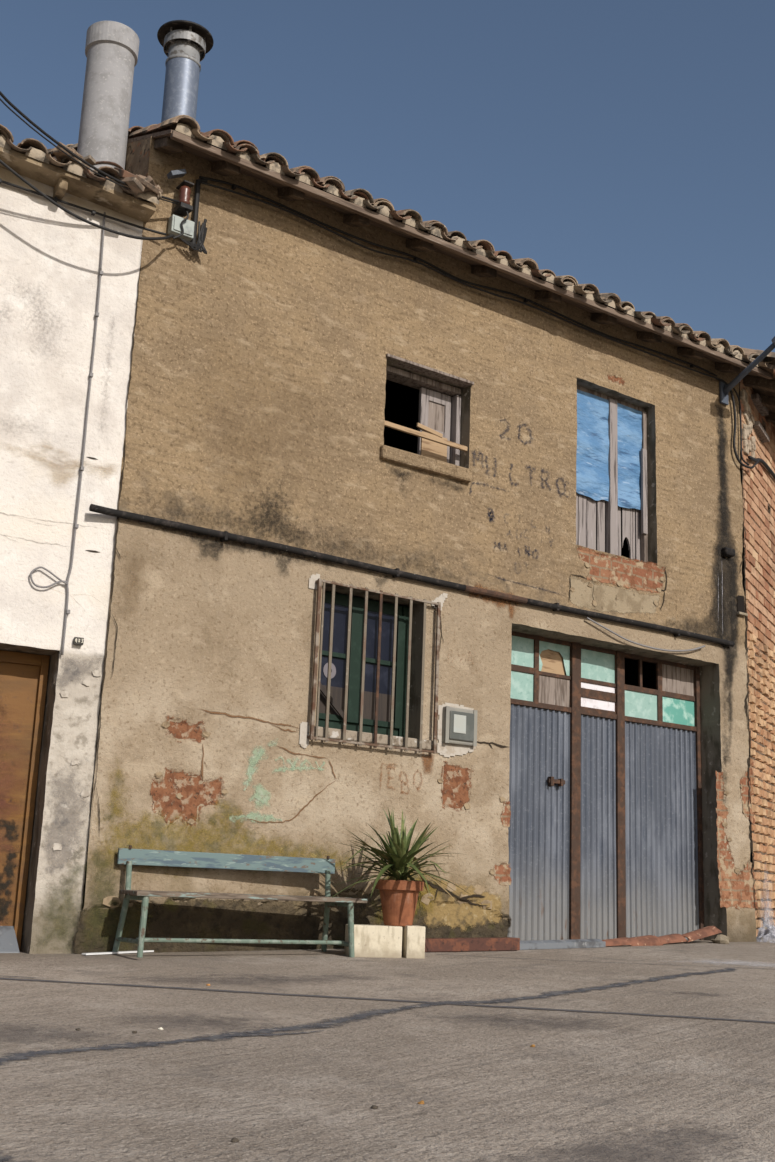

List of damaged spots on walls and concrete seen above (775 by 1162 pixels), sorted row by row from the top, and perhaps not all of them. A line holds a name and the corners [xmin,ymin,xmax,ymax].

flaking render [569,546,666,614]
leakage [687,407,738,724]
rust [0,820,18,920]
flaking render [161,716,211,743]
flaking render [150,767,229,827]
flaking render [437,702,476,811]
flaking render [715,762,758,909]
crack [0,954,775,1065]
crack [0,1154,15,1162]